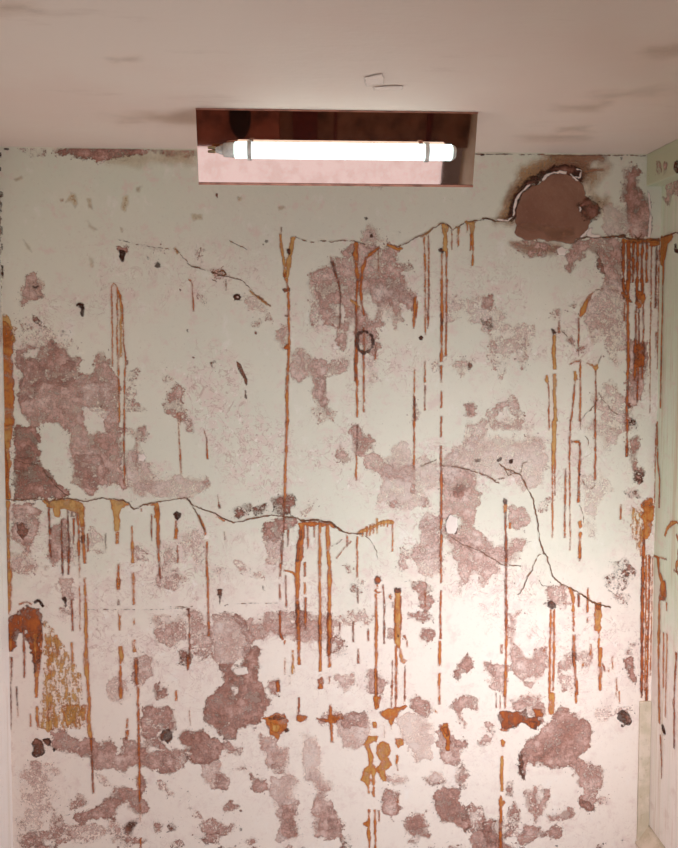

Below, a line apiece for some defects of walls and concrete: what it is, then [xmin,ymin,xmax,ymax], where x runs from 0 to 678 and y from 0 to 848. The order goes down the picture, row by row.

crack [120,240,271,307]
crack [398,216,509,247]
peeling [9,315,210,576]
crack [6,459,378,557]
peeling [18,589,375,848]
corrosion [279,228,403,689]
corrosion [361,576,408,797]
peeling [335,395,548,646]
peeling [378,612,635,848]
crack [424,459,611,608]
corrosion [496,499,556,848]
corrosion [630,421,678,749]